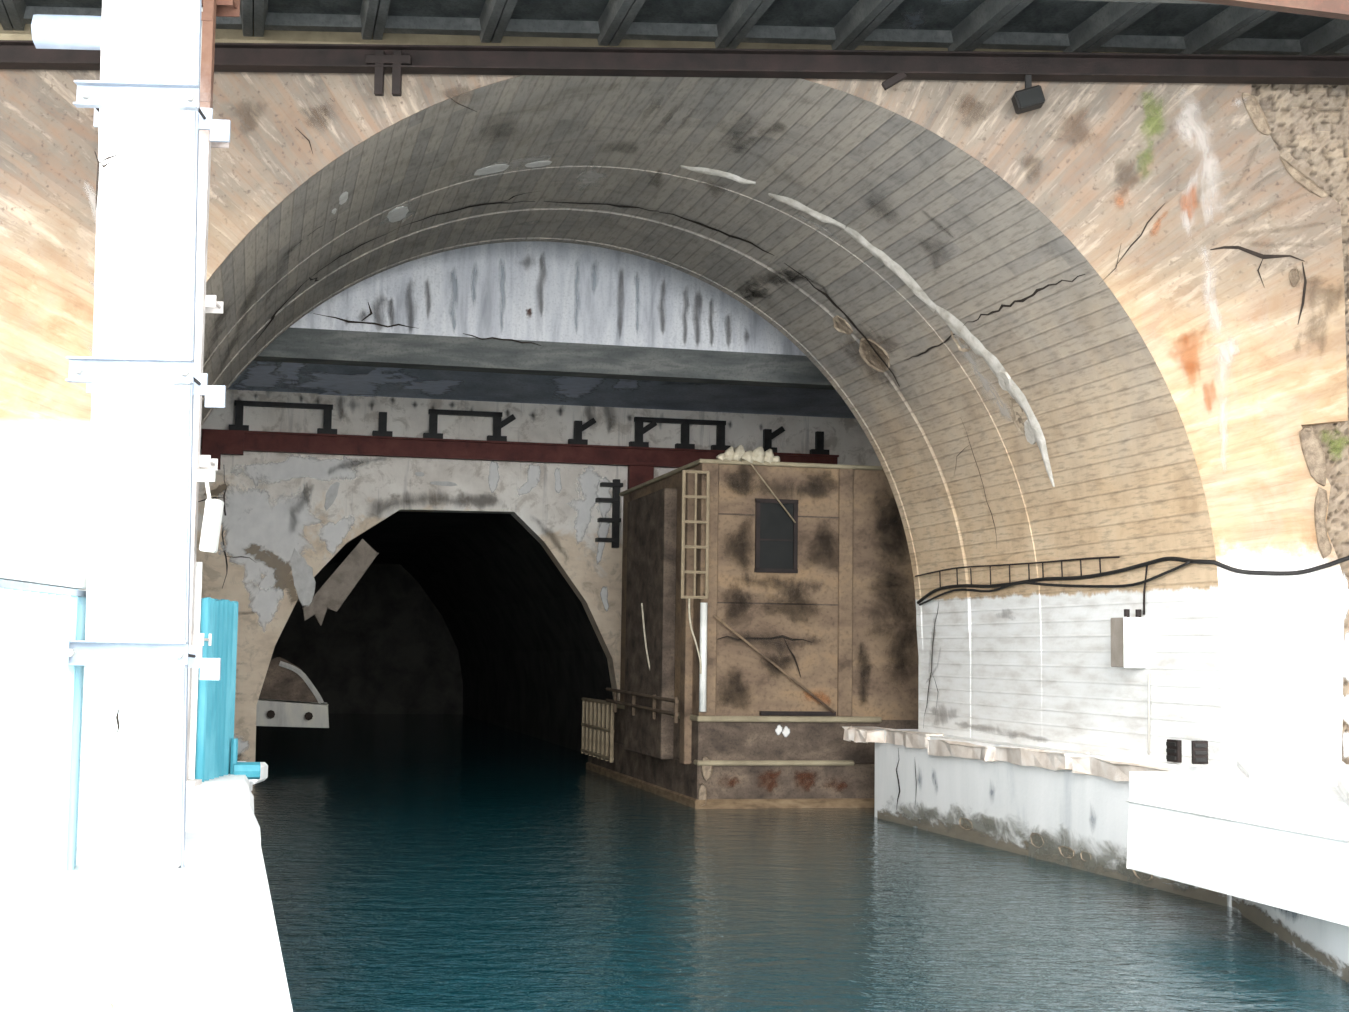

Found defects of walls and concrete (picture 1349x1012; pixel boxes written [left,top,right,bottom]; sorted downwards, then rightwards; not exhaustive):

spalling [1279,156,1328,198]
crack [251,191,1165,387]
leakage [680,165,1055,487]
crack [1210,246,1307,324]
spalling [1289,268,1300,287]
peeling [219,455,360,630]
leakage [878,500,905,553]
spalling [1299,428,1345,559]
leakage [881,573,912,672]
leakage [860,651,870,701]
leakage [877,807,1349,983]